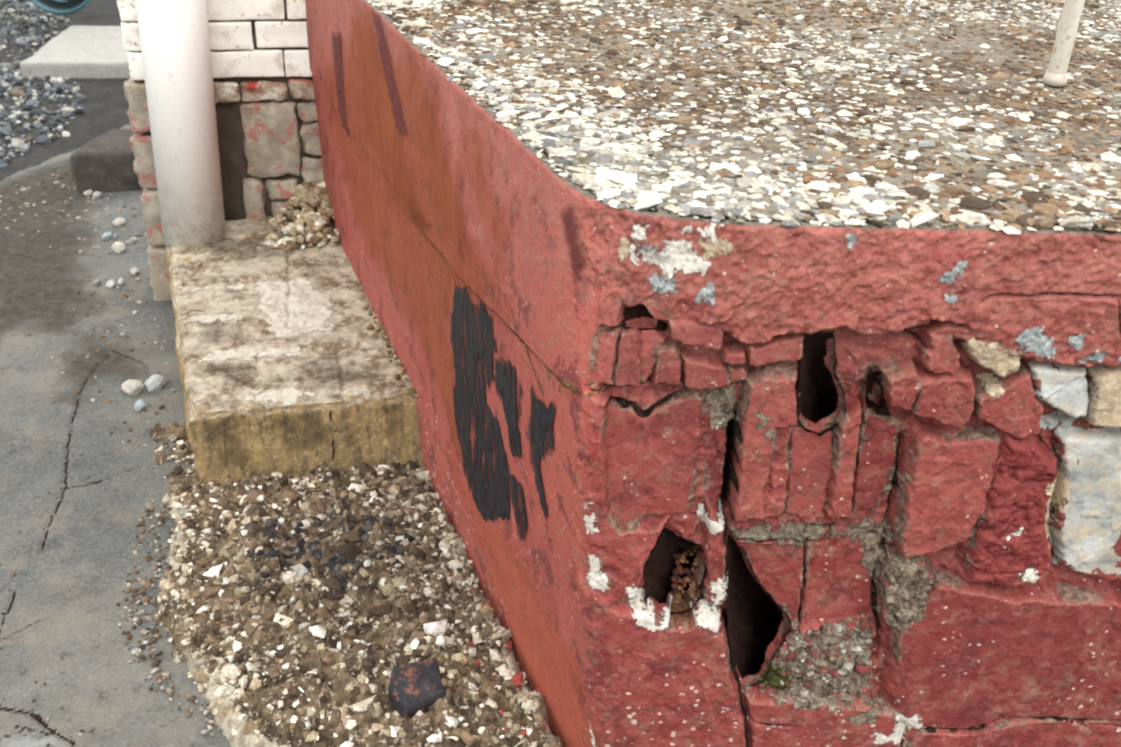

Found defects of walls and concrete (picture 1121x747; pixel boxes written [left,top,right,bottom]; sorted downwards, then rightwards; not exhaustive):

peeling [618,223,736,305]
spalling [622,304,667,331]
spalling [702,382,777,444]
spalling [797,331,846,437]
spalling [959,327,1121,576]
peeling [582,502,599,534]
peeling [586,554,610,592]
spalling [625,463,934,745]
peeling [1018,568,1040,583]
crack [723,609,787,747]
crack [923,724,986,733]
crack [1033,716,1092,727]